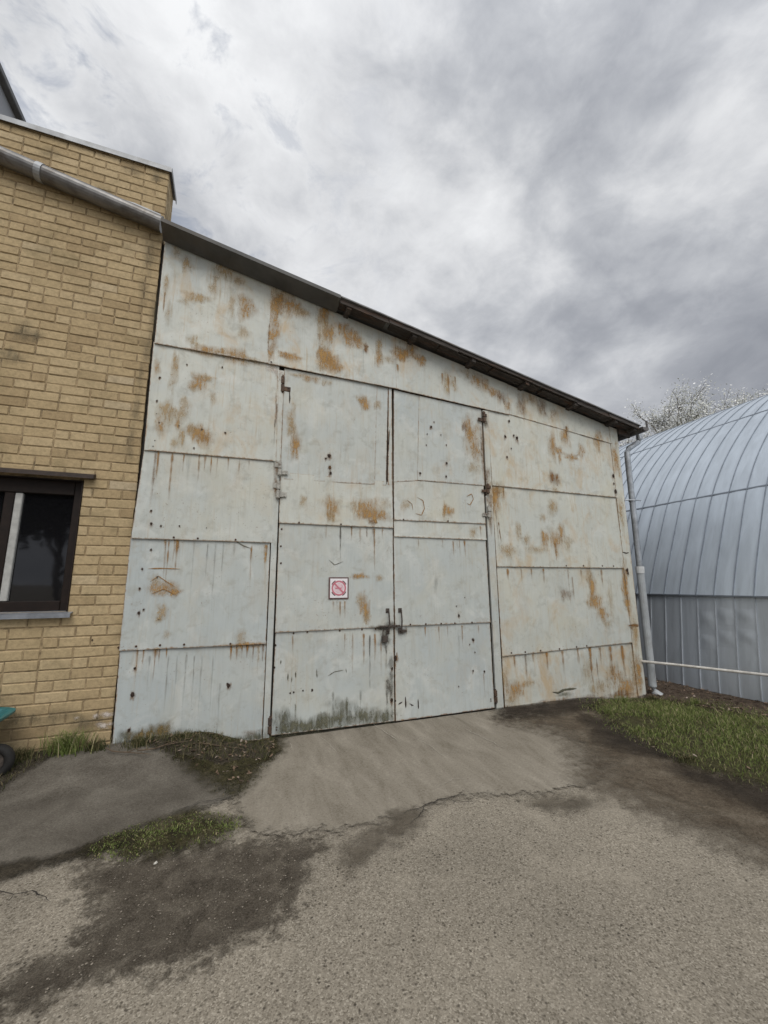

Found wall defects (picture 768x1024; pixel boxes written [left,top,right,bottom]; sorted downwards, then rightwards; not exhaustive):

corrosion [196,347,247,368]
corrosion [268,293,302,360]
corrosion [317,308,382,371]
corrosion [154,400,212,489]
corrosion [327,498,386,554]
corrosion [139,525,180,596]
corrosion [587,570,608,618]
corrosion [577,645,642,698]
water stain [279,680,393,738]
water stain [584,714,768,812]
crack [406,793,469,818]